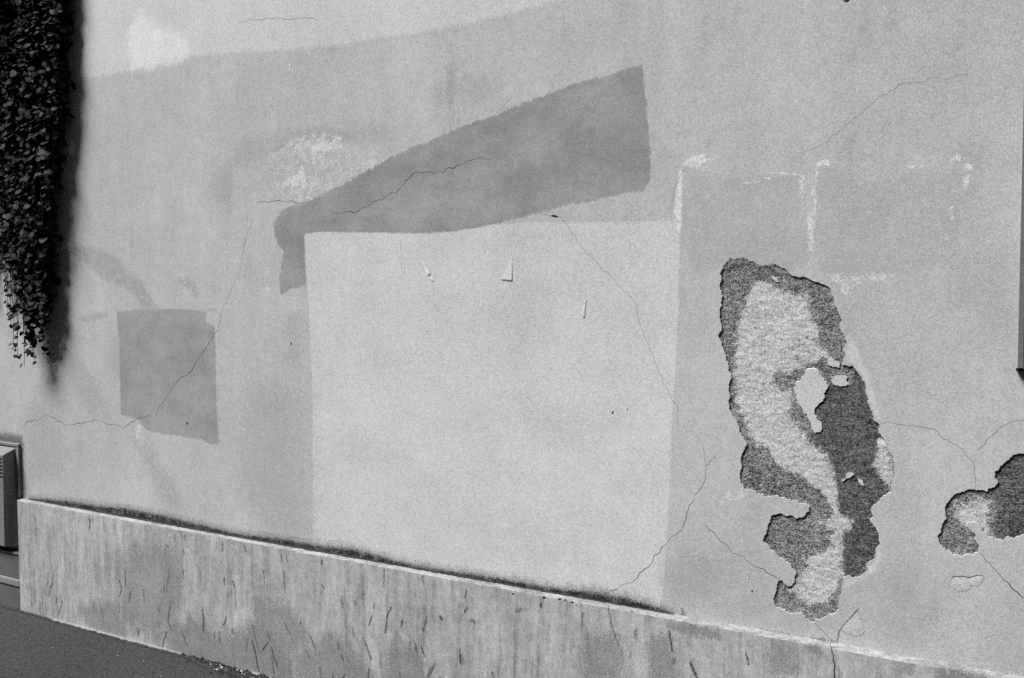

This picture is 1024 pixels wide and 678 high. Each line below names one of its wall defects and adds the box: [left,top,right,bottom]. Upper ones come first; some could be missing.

crack [525,199,778,650]
flaking render [711,158,896,623]
flaking render [937,453,1024,558]